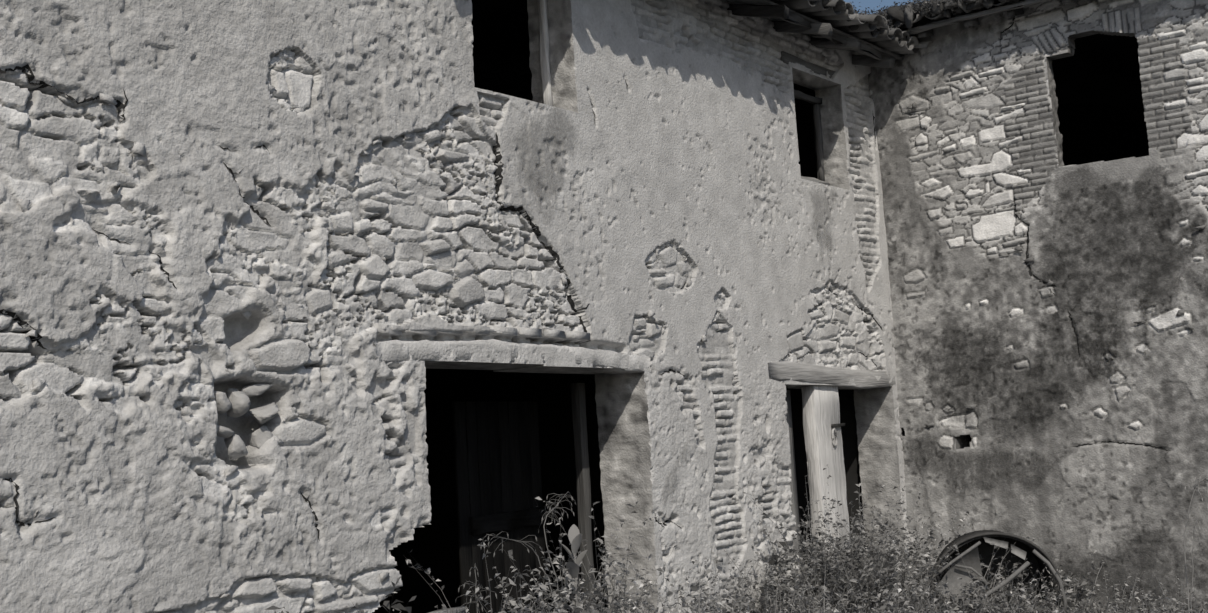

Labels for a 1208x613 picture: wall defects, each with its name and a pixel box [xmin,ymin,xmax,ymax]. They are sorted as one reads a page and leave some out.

crack [0,64,128,122]
flaking render [0,71,157,214]
flaking render [266,46,320,114]
flaking render [631,0,844,100]
flaking render [313,91,592,348]
flaking render [645,240,698,294]
flaking render [779,73,886,372]
flaking render [0,311,58,409]
flaking render [697,288,748,612]
flaking render [154,572,399,613]